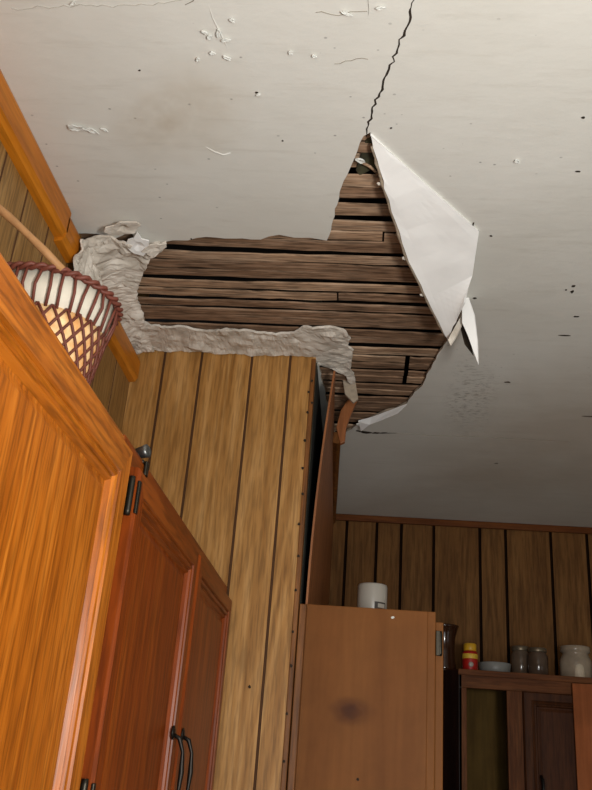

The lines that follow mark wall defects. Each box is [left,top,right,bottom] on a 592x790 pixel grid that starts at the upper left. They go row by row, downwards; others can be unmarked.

crack [366,0,414,137]
spalling [142,321,358,403]
spalling [356,404,407,431]